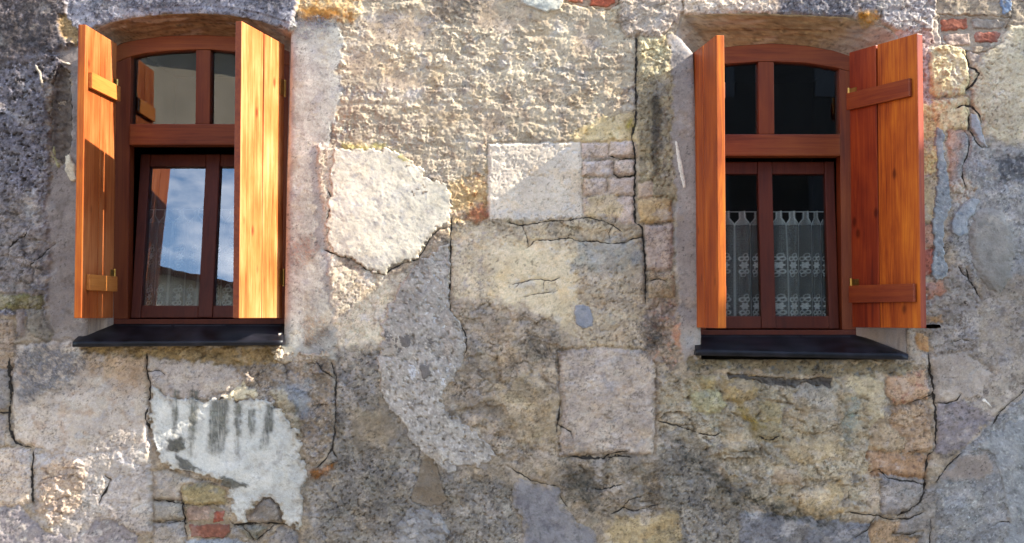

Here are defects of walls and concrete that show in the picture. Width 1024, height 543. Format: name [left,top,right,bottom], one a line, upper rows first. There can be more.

crack [509,38,665,302]
crack [957,51,988,187]
crack [325,218,467,356]
crack [0,360,34,502]
crack [145,356,164,428]
flaking render [148,383,311,539]
crack [317,362,337,468]
crack [850,354,964,543]